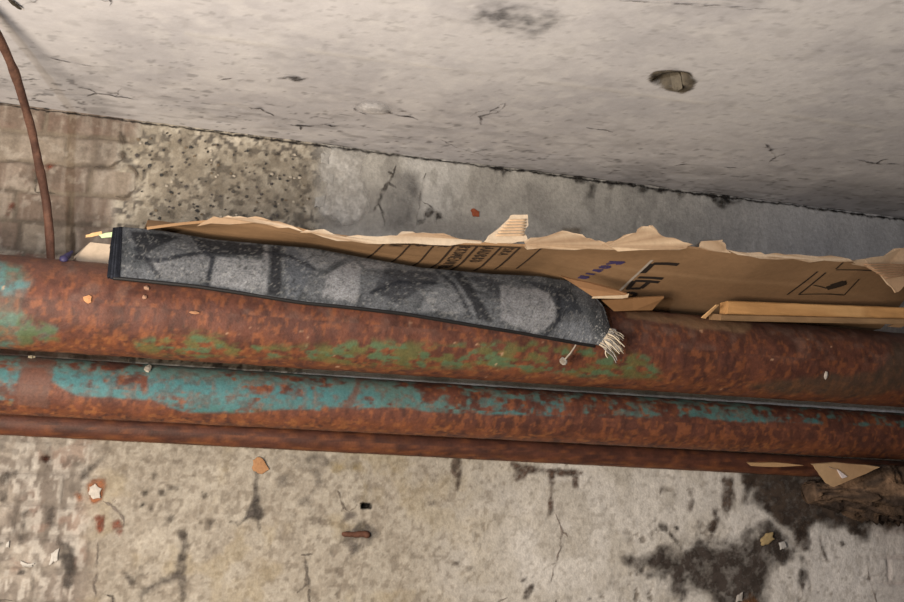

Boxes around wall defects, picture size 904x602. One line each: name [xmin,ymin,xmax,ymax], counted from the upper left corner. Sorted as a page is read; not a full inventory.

spalling [649,70,696,93]
crack [0,79,904,221]
damp [624,473,904,602]